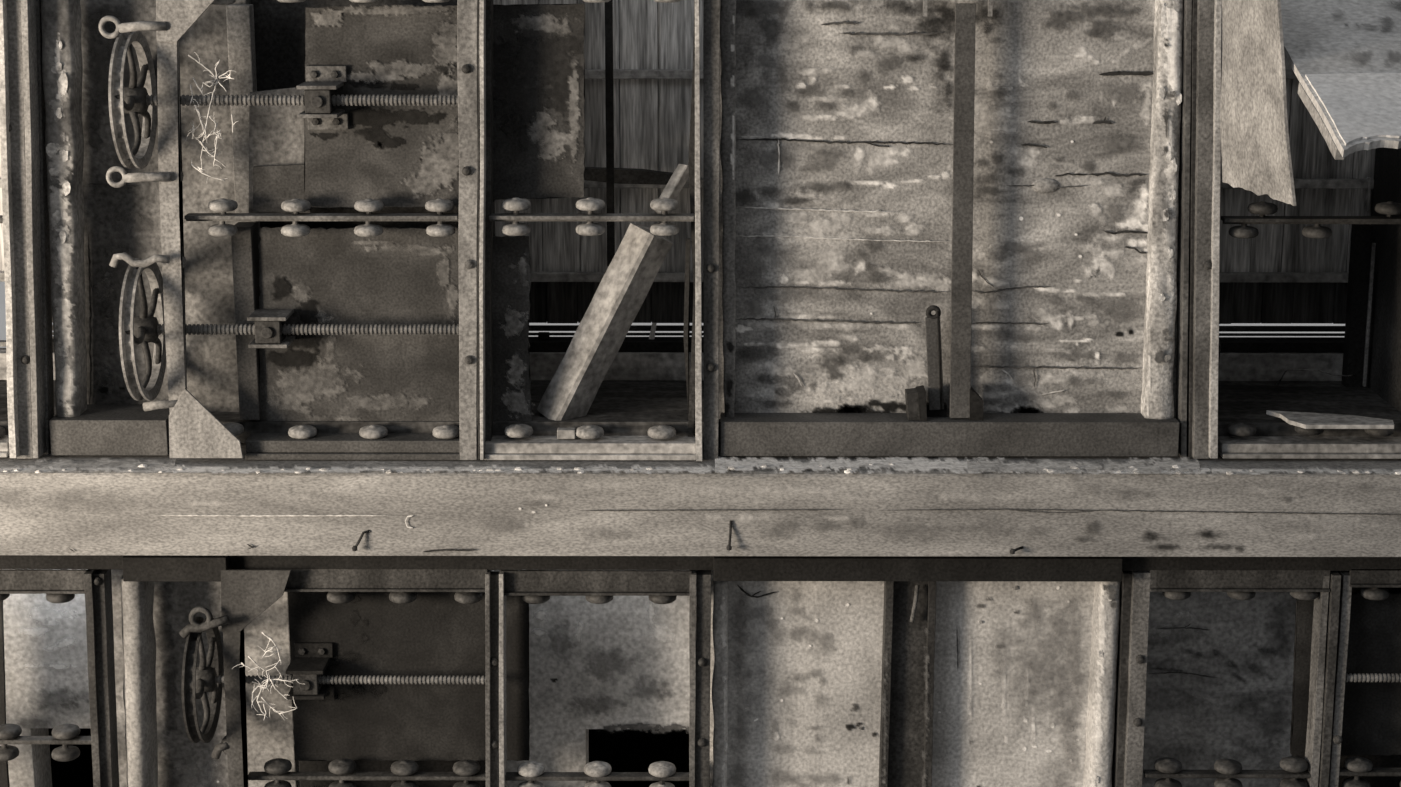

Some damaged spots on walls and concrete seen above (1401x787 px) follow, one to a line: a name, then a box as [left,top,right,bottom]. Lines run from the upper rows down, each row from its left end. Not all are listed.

peeling [511,13,571,35]
damp [976,3,998,41]
damp [1045,3,1146,65]
peeling [311,5,459,198]
peeling [528,60,580,162]
crack [737,138,953,147]
damp [974,78,1040,194]
damp [1051,104,1093,123]
damp [1106,82,1152,125]
damp [735,0,955,408]
crack [736,270,1051,325]
damp [971,162,1149,413]